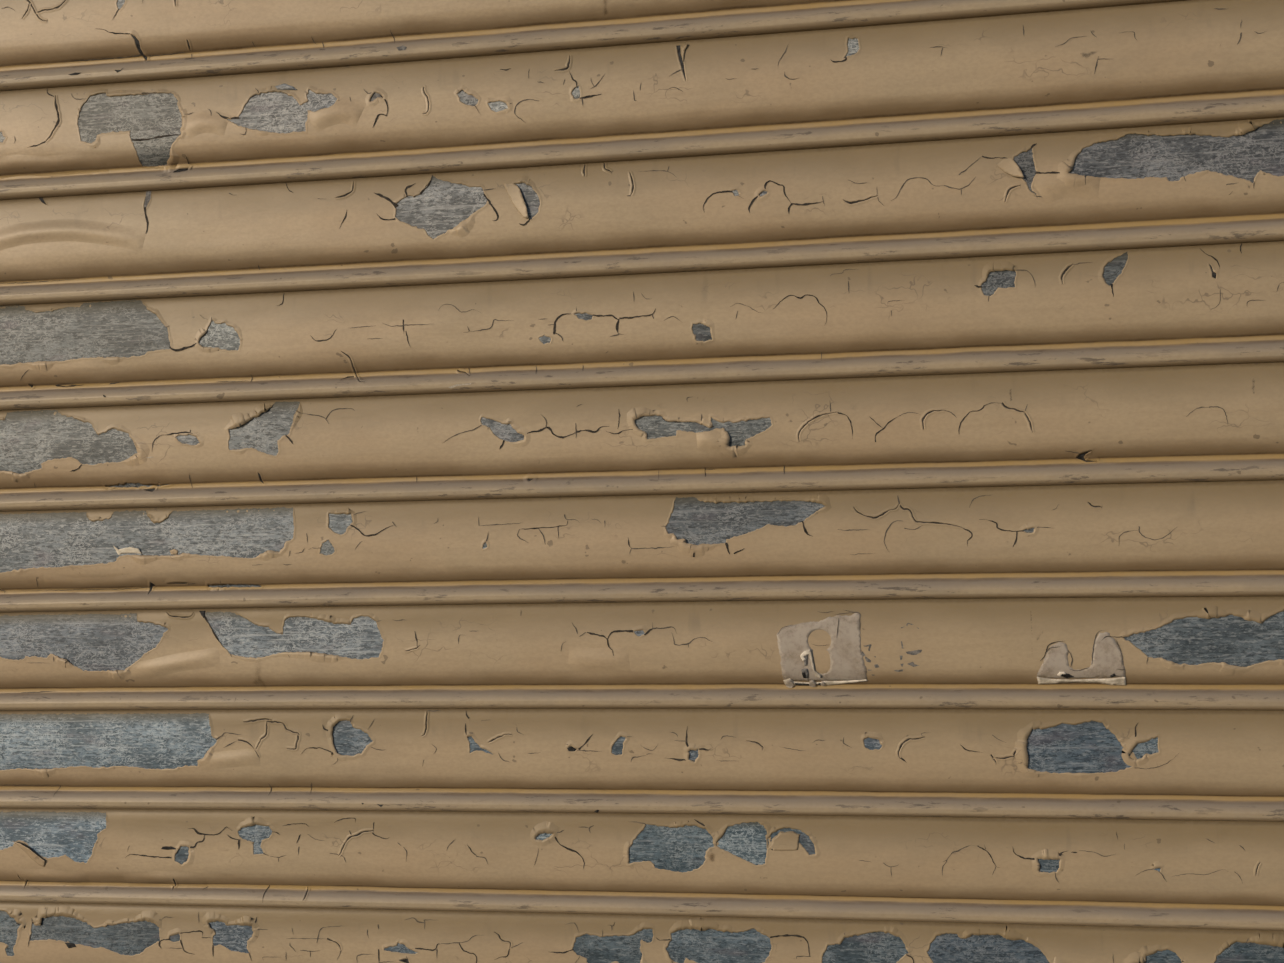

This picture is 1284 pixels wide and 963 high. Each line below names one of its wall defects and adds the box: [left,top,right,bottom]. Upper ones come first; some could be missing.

peeling [997,118,1284,200]
peeling [0,300,243,372]
peeling [0,409,204,491]
crack [784,401,1036,473]
peeling [0,506,297,575]
crack [838,495,990,555]
peeling [0,612,170,680]
peeling [1101,604,1284,676]
peeling [0,712,239,778]
peeling [0,810,109,867]
peeling [623,819,821,875]
peeling [552,917,1066,963]